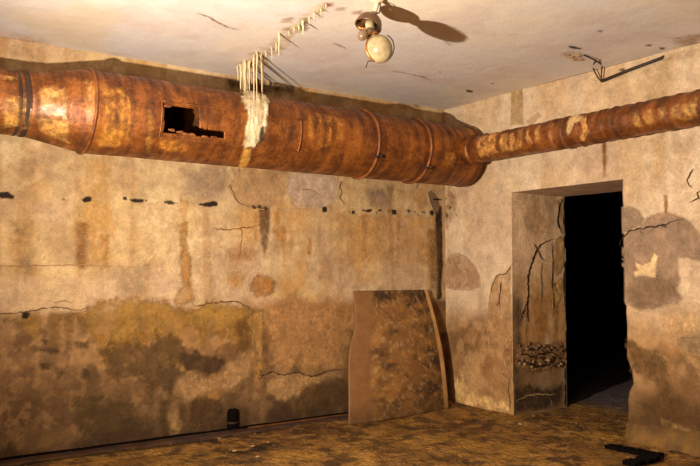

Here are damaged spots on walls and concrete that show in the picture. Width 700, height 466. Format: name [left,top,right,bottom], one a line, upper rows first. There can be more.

rust [239,149,250,167]
crack [213,172,262,256]
crack [619,219,679,247]
flaking render [445,253,481,290]
crack [490,265,512,306]
crack [520,199,563,321]
flaking render [622,206,700,311]
crack [0,300,90,314]
damp [78,223,348,413]
crack [191,301,255,313]
spalling [487,271,564,383]
crack [259,369,342,379]